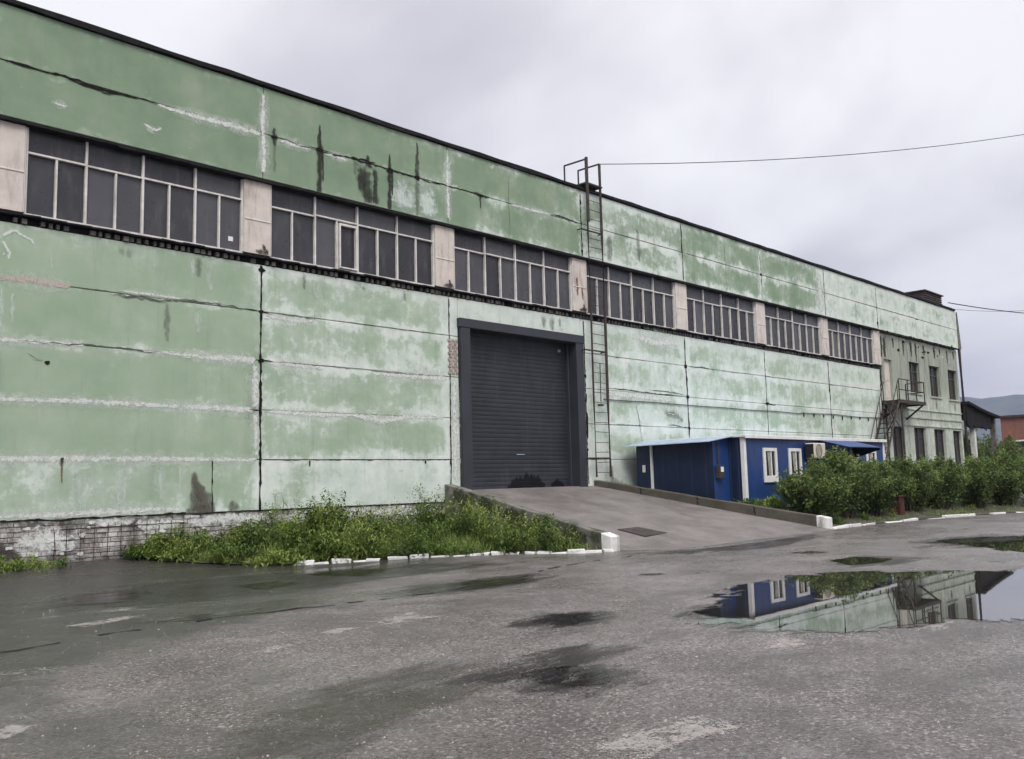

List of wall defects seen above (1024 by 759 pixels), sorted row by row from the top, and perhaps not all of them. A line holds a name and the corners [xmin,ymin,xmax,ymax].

crack [0,58,160,106]
damp [316,126,324,191]
damp [355,143,437,216]
damp [179,473,214,513]
flaking render [0,502,272,557]